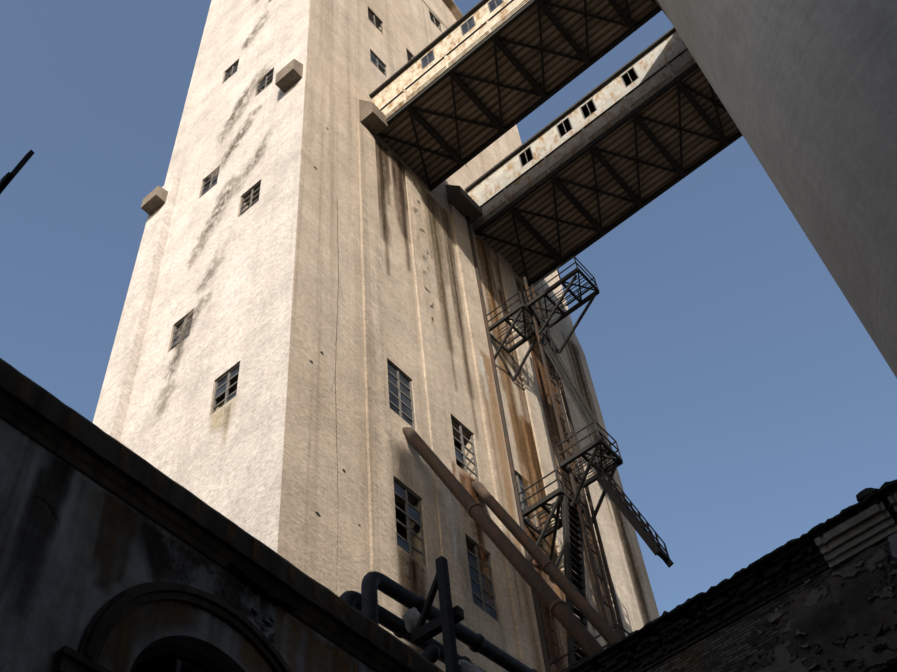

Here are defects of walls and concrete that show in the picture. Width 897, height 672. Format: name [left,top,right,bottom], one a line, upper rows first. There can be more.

damp [375,139,389,239]
damp [423,191,472,394]
rust [121,446,129,465]
rust [472,235,560,569]
rust [516,280,613,627]
flaking render [750,548,897,672]